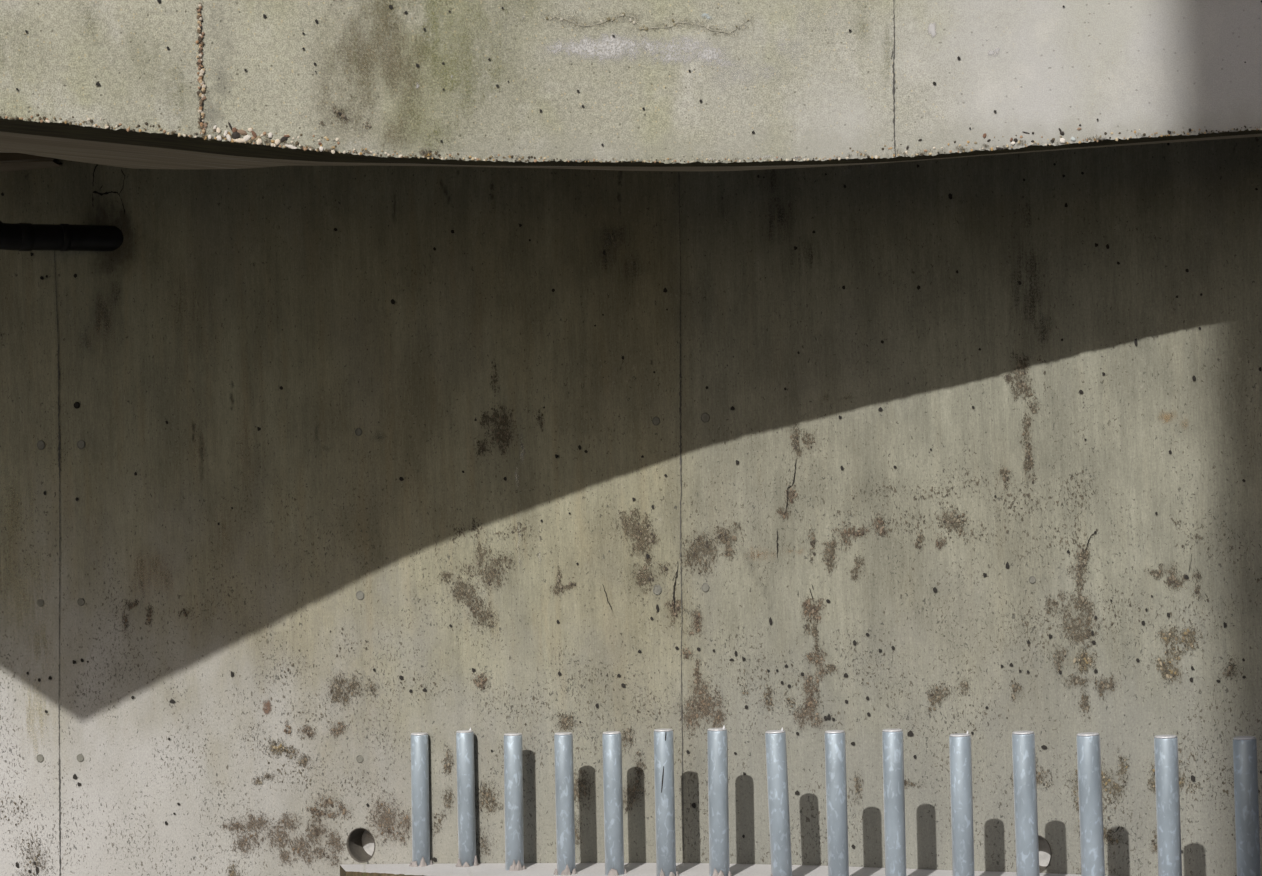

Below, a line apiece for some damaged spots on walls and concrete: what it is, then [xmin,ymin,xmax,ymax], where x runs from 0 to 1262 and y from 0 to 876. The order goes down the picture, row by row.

crack [197,8,205,130]
water stain [548,34,729,66]
spalling [0,106,1262,163]